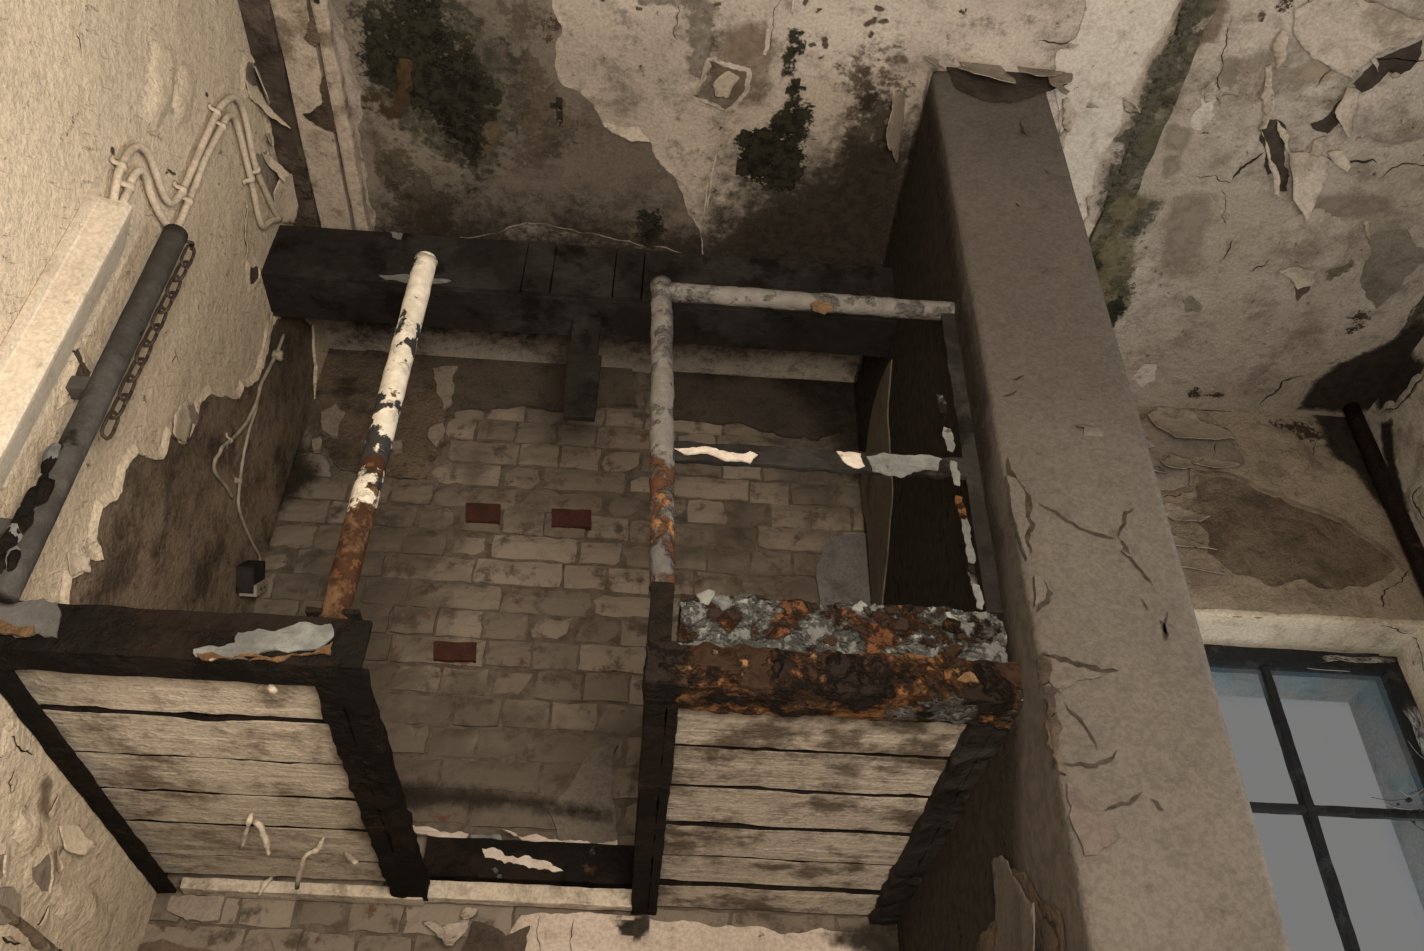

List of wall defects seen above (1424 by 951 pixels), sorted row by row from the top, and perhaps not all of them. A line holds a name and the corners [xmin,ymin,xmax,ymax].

leakage [345,0,579,229]
peeling [330,0,705,254]
leakage [711,5,916,193]
peeling [923,56,1099,150]
crack [1326,157,1424,183]
crack [1388,286,1424,342]
flaking render [0,316,389,639]
spalling [383,358,458,491]
crack [1378,368,1424,415]
crack [1005,458,1169,640]
peeling [193,622,334,659]
crack [1063,703,1117,768]